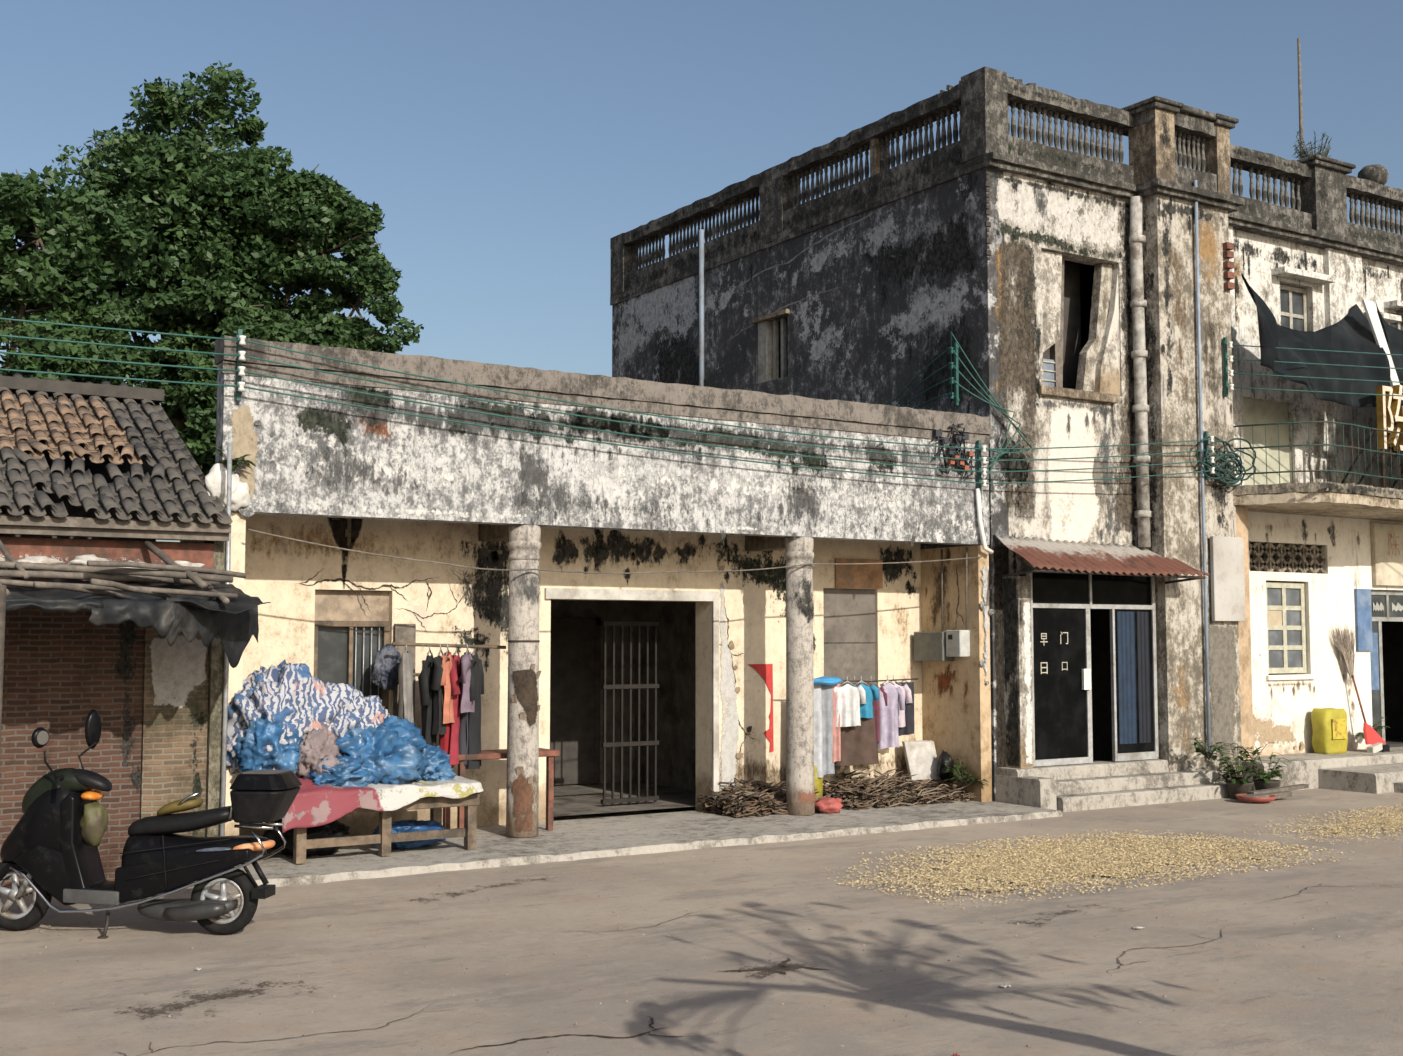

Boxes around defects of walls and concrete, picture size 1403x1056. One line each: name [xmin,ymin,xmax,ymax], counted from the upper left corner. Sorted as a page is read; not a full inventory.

water stain [633,182,750,236]
water stain [1232,146,1330,225]
water stain [624,231,771,289]
water stain [1233,237,1318,334]
water stain [1363,264,1403,301]
water stain [654,319,706,386]
water stain [1202,322,1232,453]
water stain [782,146,1224,768]
water stain [251,383,960,672]
water stain [1210,474,1229,529]
crack [300,568,470,634]
spalling [511,664,541,728]